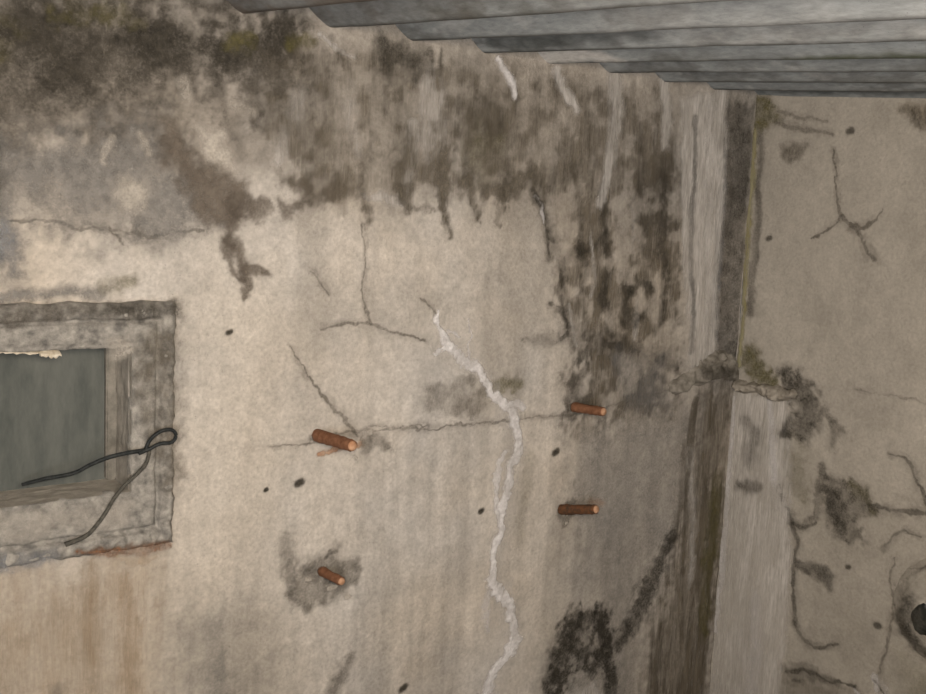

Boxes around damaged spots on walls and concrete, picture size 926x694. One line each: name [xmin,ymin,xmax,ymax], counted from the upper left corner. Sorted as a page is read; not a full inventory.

water stain [0,0,310,300]
crack [811,149,877,261]
water stain [0,287,105,304]
crack [336,292,425,341]
crack [291,347,357,435]
water stain [277,56,817,694]
water stain [816,463,857,543]
crack [785,506,803,612]
crack [787,668,856,688]